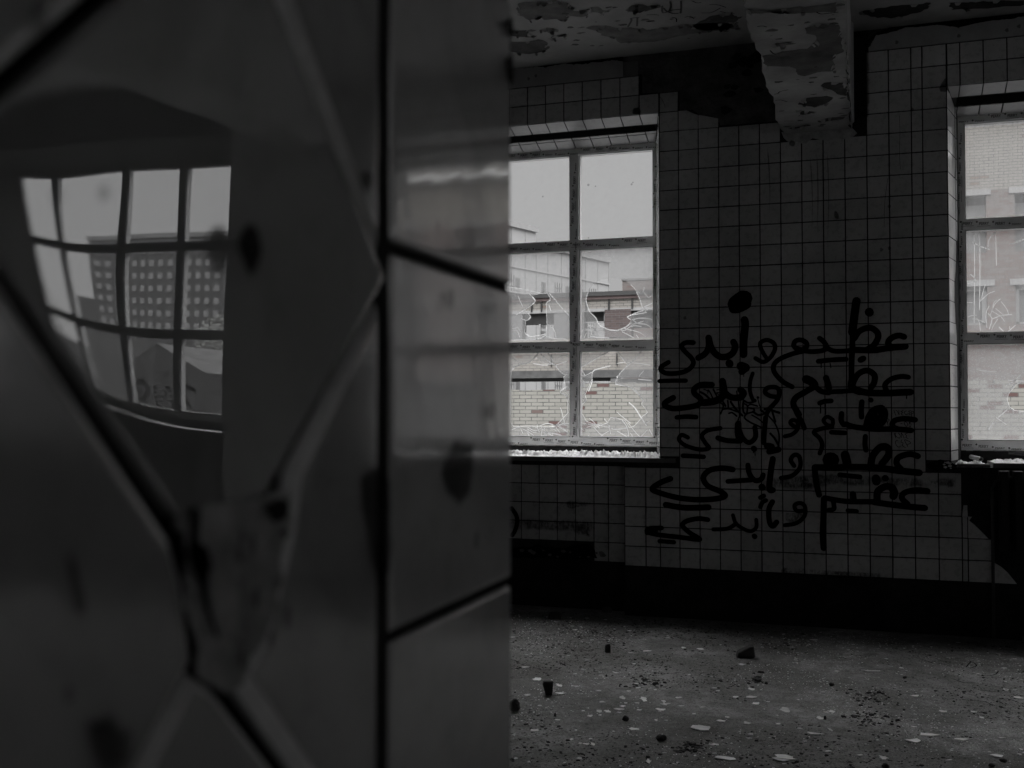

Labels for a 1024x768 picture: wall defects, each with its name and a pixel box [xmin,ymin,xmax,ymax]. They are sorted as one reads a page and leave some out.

peeling [859,2,933,18]
peeling [949,0,1024,12]
peeling [505,0,849,130]